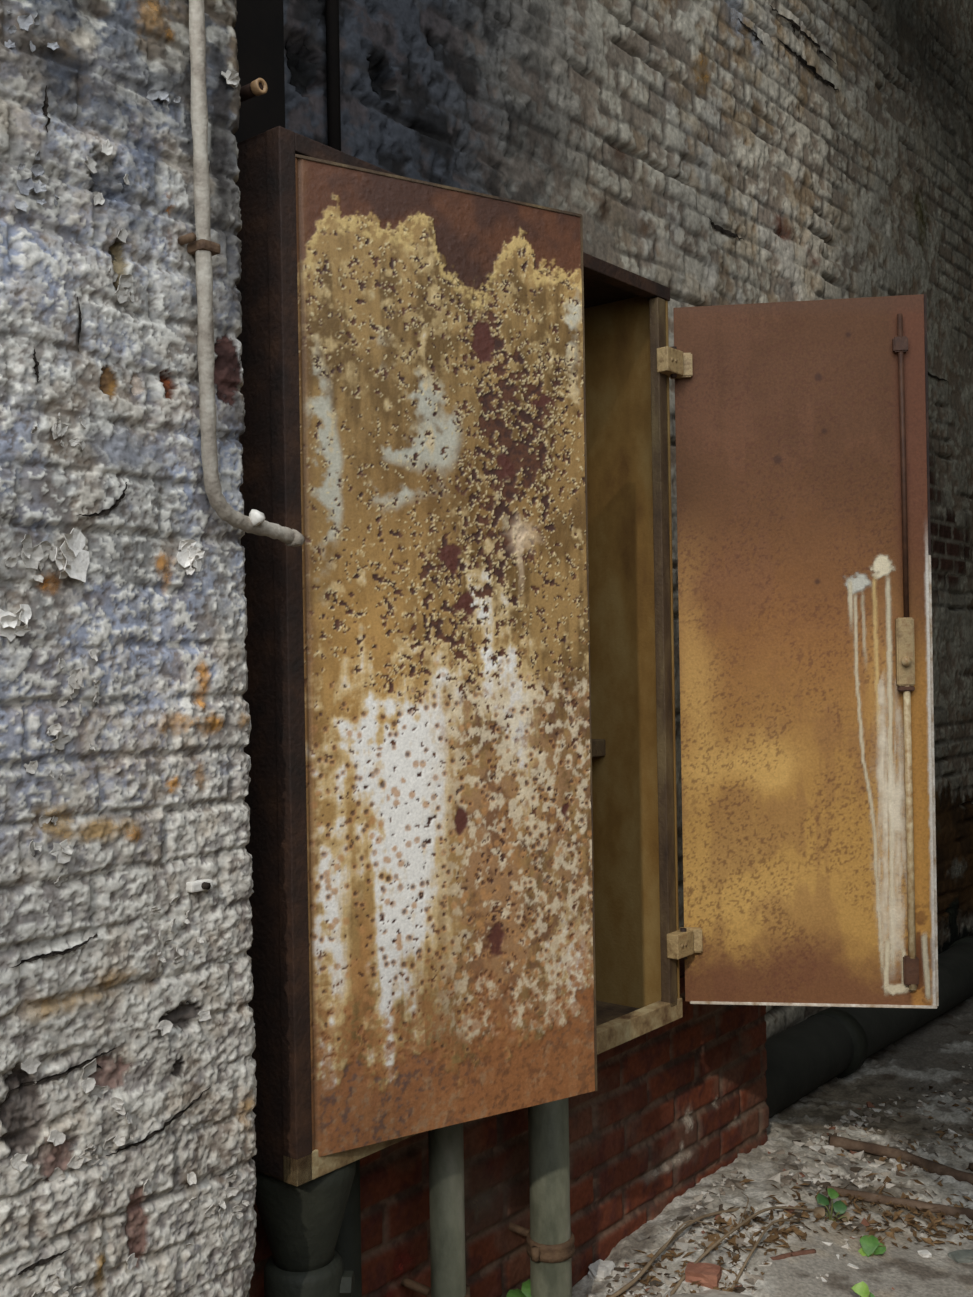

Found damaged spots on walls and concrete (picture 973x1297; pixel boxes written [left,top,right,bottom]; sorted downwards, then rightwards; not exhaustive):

crack [738,5,839,91]
peeling [929,450,972,591]
flaking render [935,784,973,927]
peeling [31,1267,83,1297]